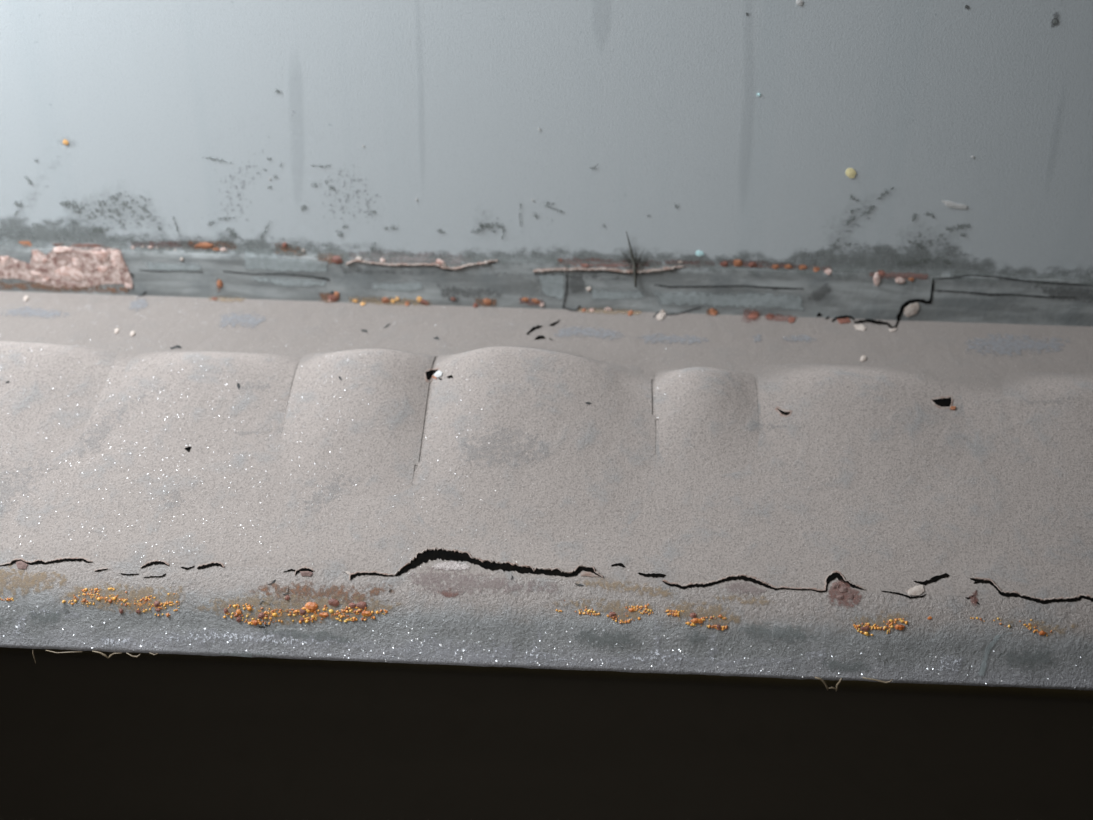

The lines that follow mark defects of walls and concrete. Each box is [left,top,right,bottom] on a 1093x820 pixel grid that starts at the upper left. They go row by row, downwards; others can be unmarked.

water stain [59,193,161,233]
peeling [0,241,133,289]
corrosion [557,258,832,275]
corrosion [319,291,431,306]
crack [817,274,1091,332]
corrosion [0,569,182,617]
crack [0,557,224,578]
crack [259,566,314,605]
corrosion [199,582,397,626]
corrosion [556,579,769,631]
crack [345,547,1093,604]
water stain [150,632,348,648]